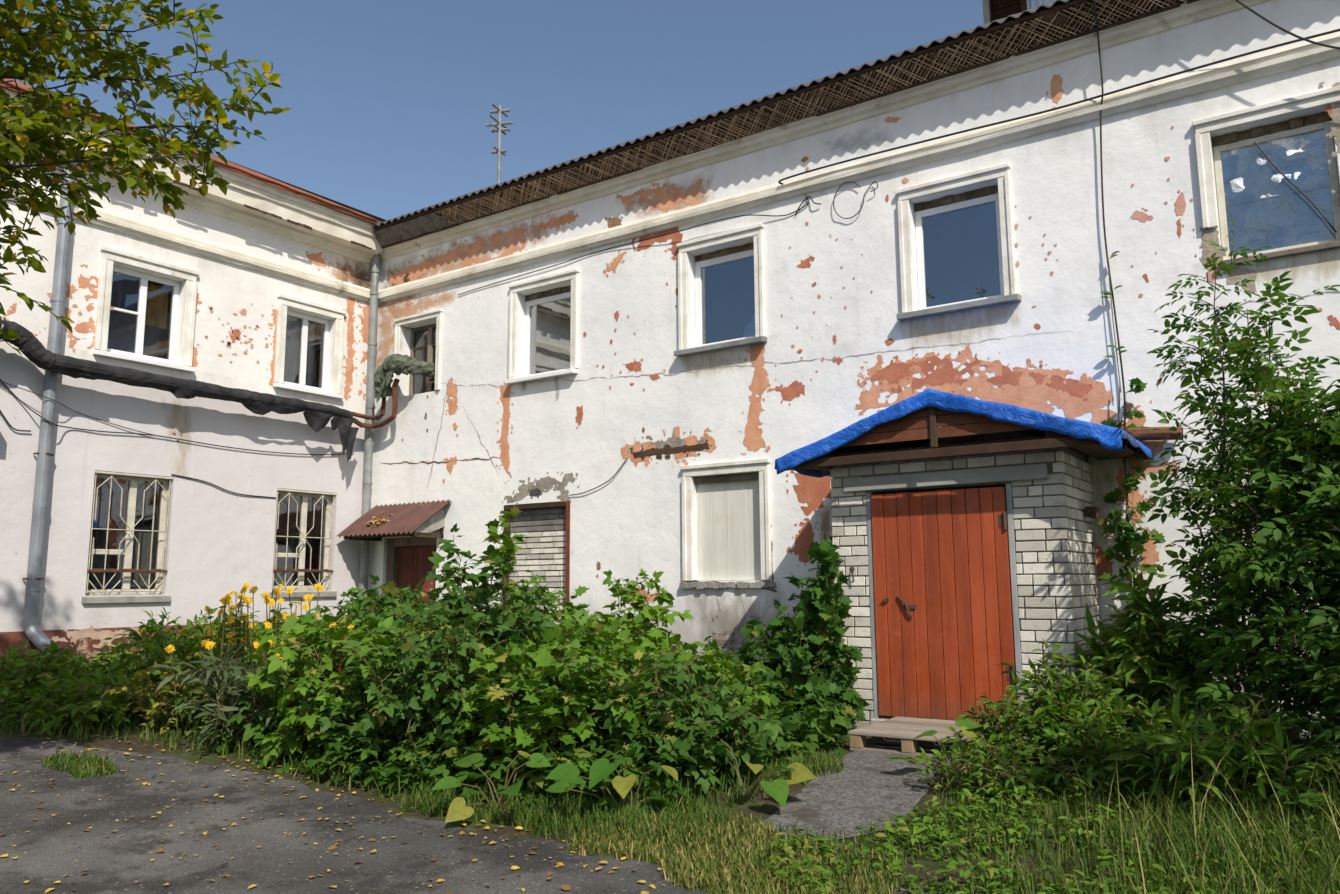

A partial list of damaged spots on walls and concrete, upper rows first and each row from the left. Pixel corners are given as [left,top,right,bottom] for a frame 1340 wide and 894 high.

peeling [47,264,99,353]
peeling [387,210,578,285]
peeling [603,227,683,308]
peeling [604,179,704,228]
peeling [797,254,855,313]
spalling [496,382,580,505]
spalling [621,426,717,467]
crack [383,331,1074,487]
peeling [740,324,843,455]
peeling [855,338,1180,573]
peeling [785,470,833,569]
peeling [39,623,134,653]